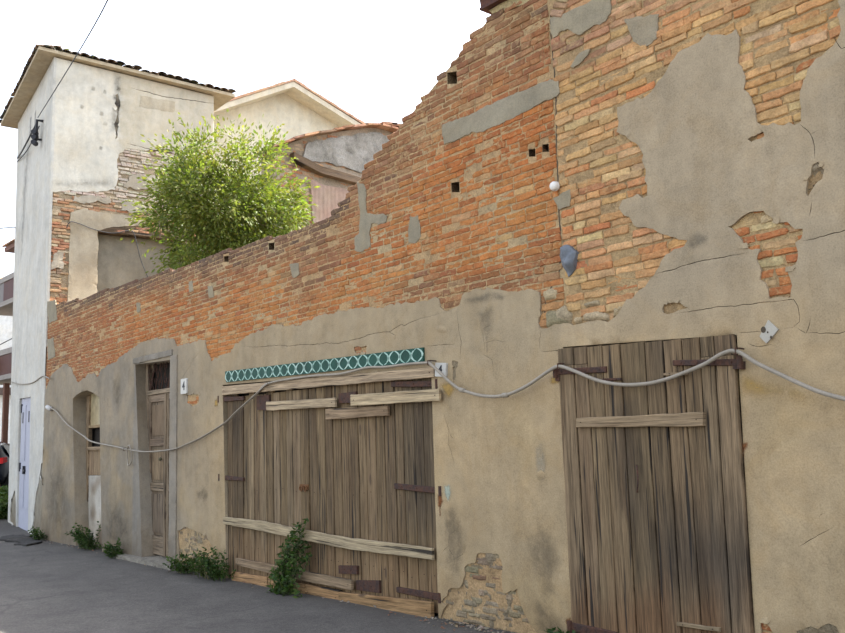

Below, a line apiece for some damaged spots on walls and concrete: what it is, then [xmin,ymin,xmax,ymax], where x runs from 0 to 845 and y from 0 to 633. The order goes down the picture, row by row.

spalling [803,162,824,190]
spalling [730,211,811,303]
spalling [443,553,529,630]
spalling [797,624,839,633]